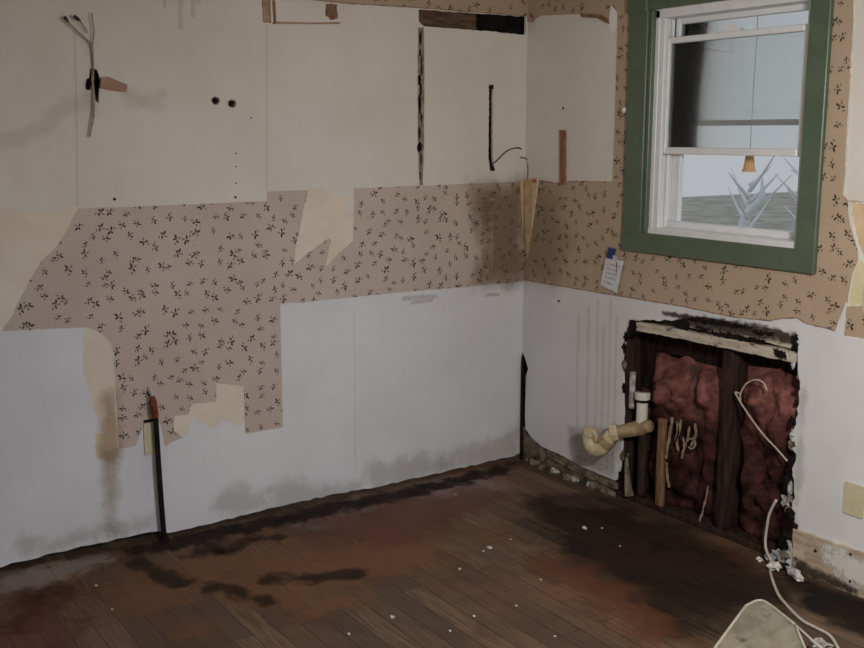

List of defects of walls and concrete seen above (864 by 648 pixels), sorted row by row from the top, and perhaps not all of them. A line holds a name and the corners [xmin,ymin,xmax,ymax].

peeling [0,204,78,332]
peeling [294,184,355,266]
peeling [520,177,539,257]
peeling [844,200,864,341]
peeling [83,328,119,459]
peeling [166,383,245,447]
spalling [522,360,625,497]
spalling [621,328,631,371]
damp [662,311,795,344]
spalling [676,317,800,406]
spalling [756,416,804,582]
damp [794,557,857,596]